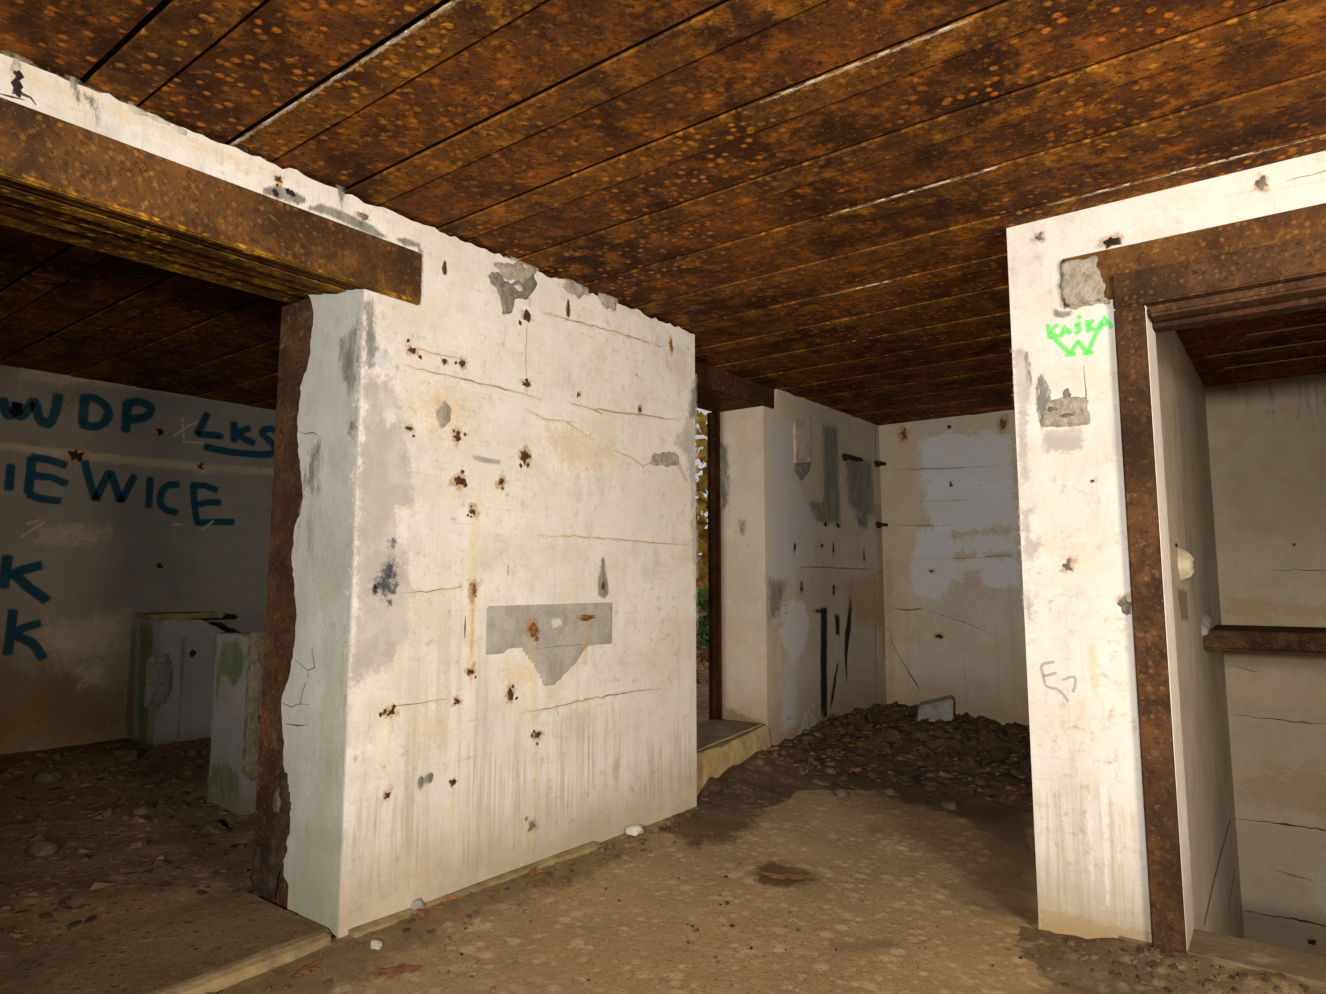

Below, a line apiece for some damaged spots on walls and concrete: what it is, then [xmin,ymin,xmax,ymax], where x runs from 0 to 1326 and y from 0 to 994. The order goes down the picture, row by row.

corrosion [1255,175,1269,192]
corrosion [1103,236,1121,249]
spalling [488,256,539,315]
corrosion [519,450,531,469]
corrosion [454,470,468,488]
peeling [911,348,1091,620]